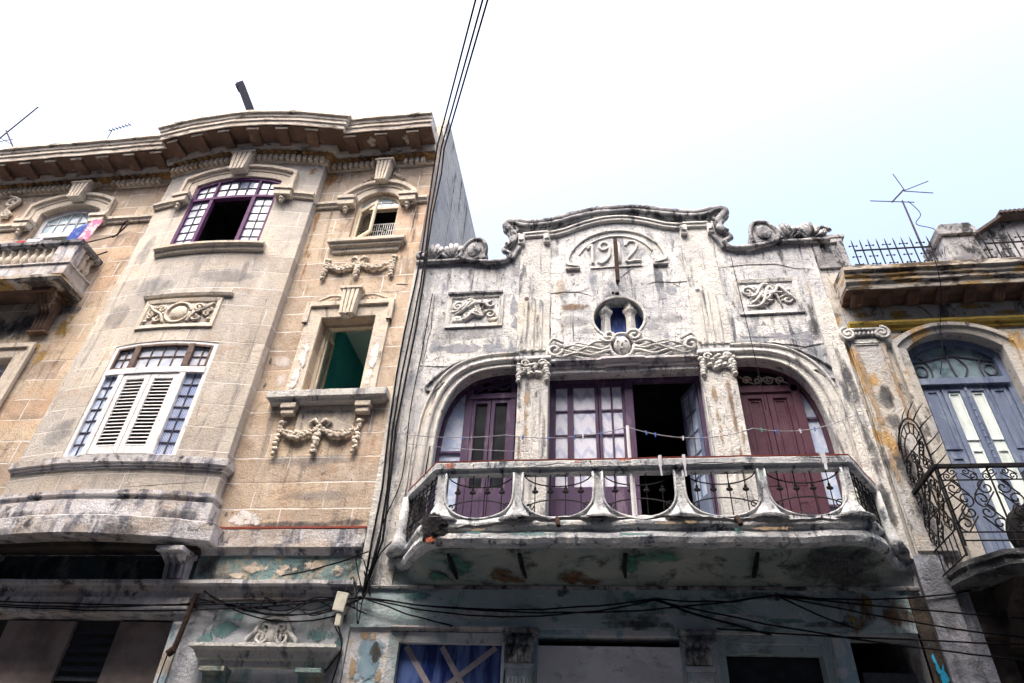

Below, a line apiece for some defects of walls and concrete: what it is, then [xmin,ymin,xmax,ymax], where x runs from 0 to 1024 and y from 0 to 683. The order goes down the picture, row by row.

water stain [447,275,503,295]
water stain [0,315,35,339]
water stain [56,306,81,337]
water stain [835,350,859,402]
water stain [880,386,900,426]
water stain [863,430,897,525]
water stain [895,445,917,480]
water stain [65,512,138,534]
water stain [154,509,197,520]
spalling [420,512,448,543]
peeling [228,560,343,578]
peeling [349,631,385,683]